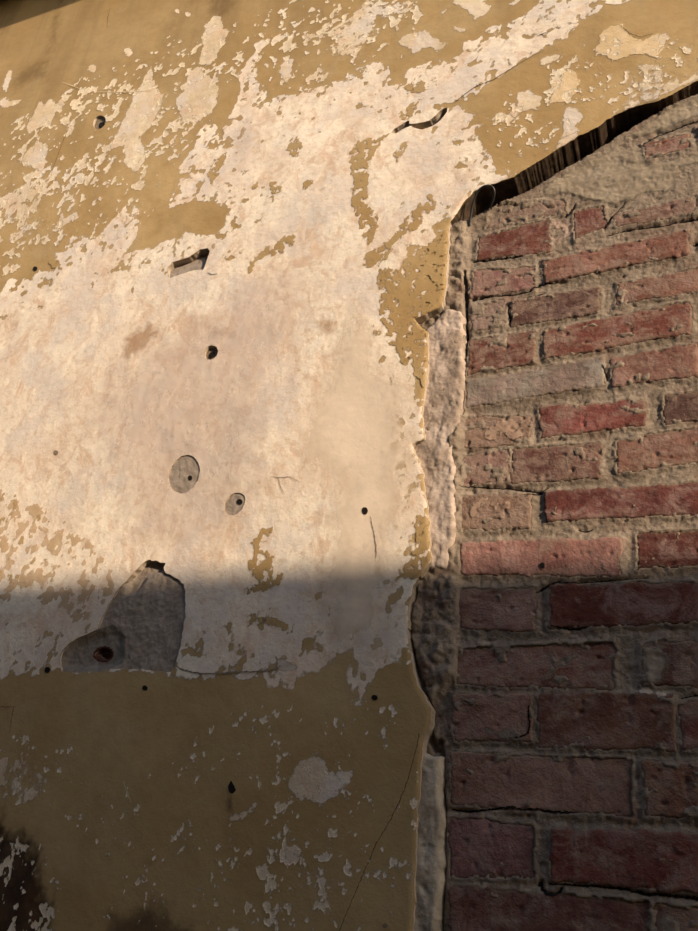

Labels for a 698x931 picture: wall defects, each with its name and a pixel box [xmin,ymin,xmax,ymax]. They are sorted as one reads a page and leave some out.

peeling [0,0,698,710]
peeling [0,730,82,813]
peeling [192,704,412,931]
crack [339,734,420,931]